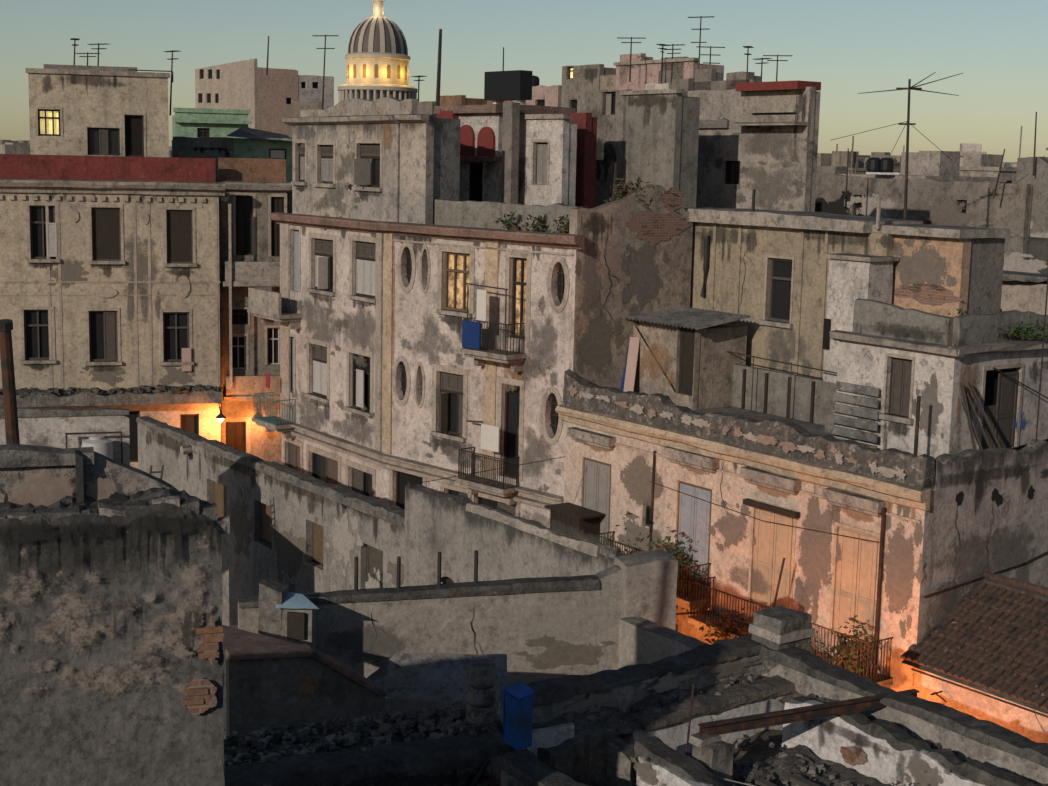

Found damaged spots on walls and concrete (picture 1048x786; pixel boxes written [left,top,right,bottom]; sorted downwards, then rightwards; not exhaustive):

peeling [504,187,710,428]
crack [600,226,620,320]
peeling [815,191,994,306]
peeling [722,426,906,480]
peeling [912,374,944,439]
peeling [0,569,41,654]
peeling [0,472,230,534]
peeling [34,563,227,715]
peeling [270,520,306,592]
peeling [708,500,756,551]
peeling [794,487,841,624]
peeling [876,505,924,639]